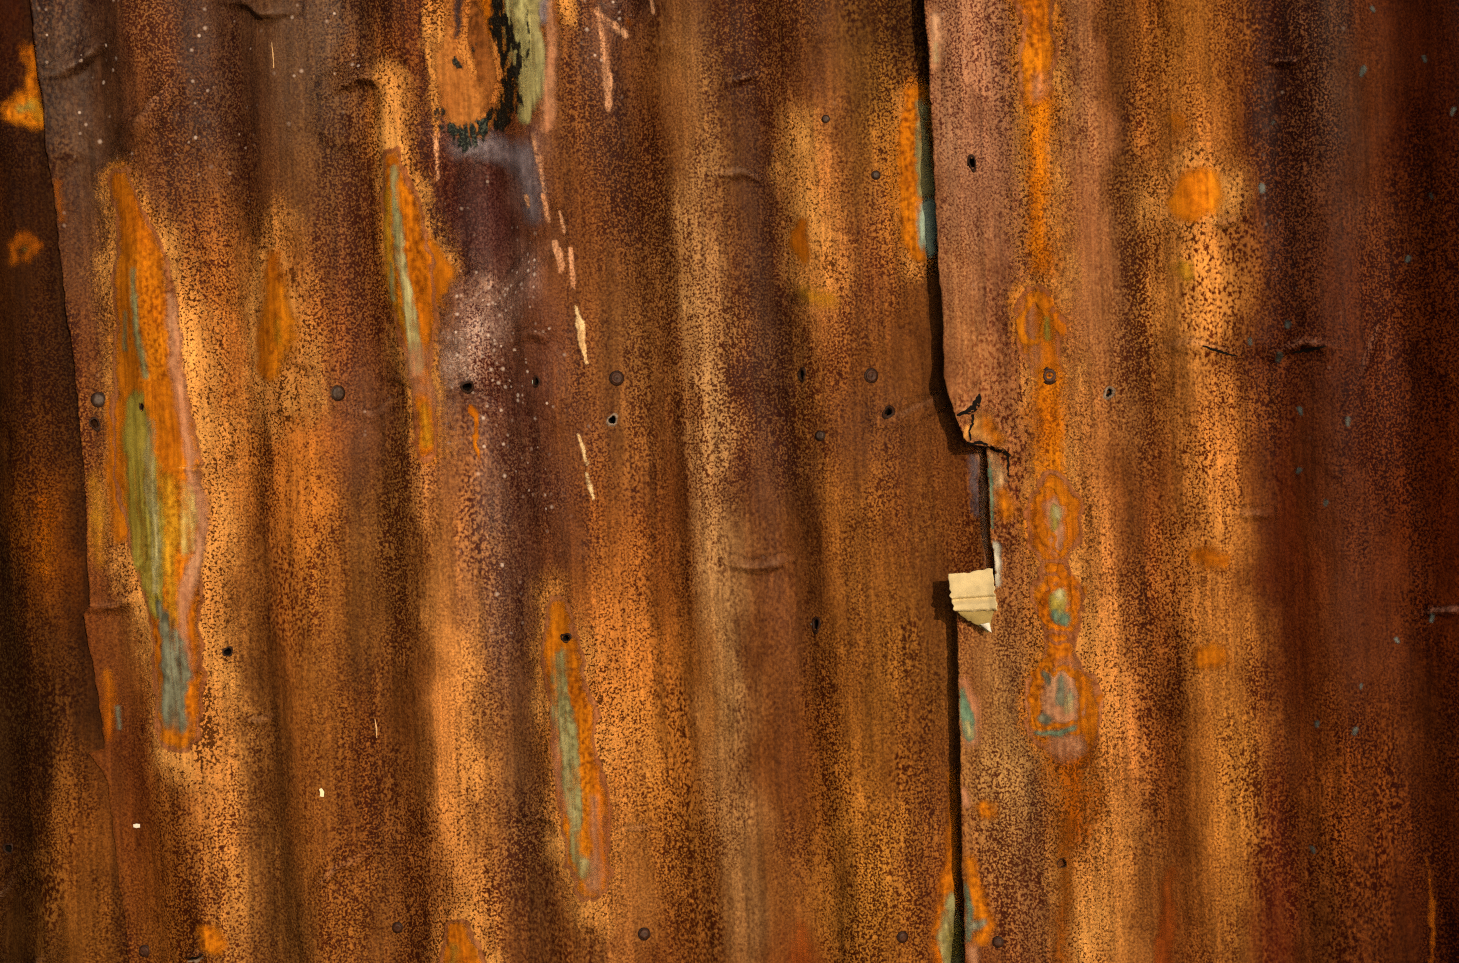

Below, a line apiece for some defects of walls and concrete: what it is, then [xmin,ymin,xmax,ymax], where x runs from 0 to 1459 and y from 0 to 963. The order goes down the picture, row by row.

corrosion [370,59,459,465]
corrosion [889,13,945,280]
corrosion [96,161,326,789]
corrosion [963,0,1132,963]
corrosion [432,888,501,963]
corrosion [530,569,630,943]
corrosion [933,770,995,963]